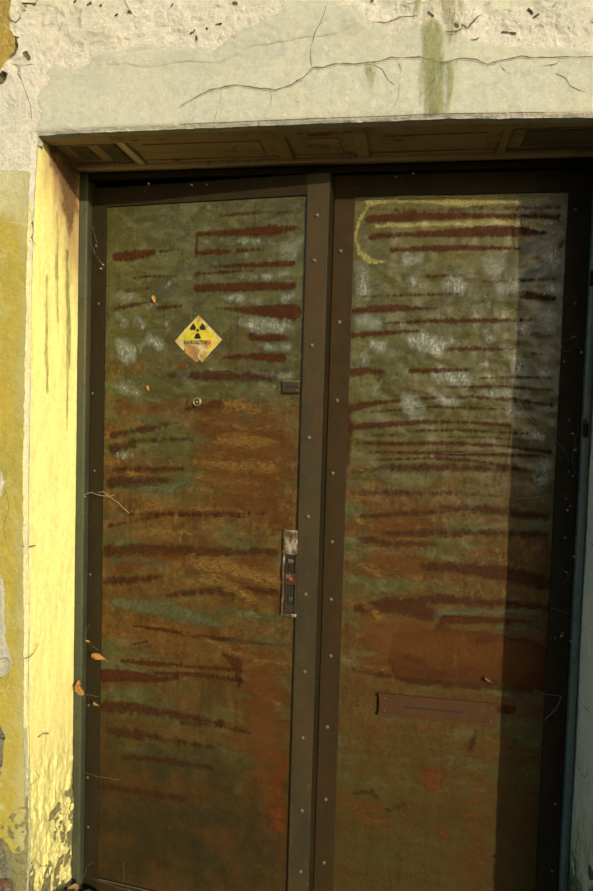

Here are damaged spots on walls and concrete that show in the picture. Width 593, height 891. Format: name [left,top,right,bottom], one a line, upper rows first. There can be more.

flaking render [0,0,38,84]
crack [181,5,593,123]
leakage [424,0,455,111]
corrosion [193,224,296,293]
corrosion [366,203,562,253]
corrosion [221,303,301,321]
corrosion [249,332,287,342]
corrosion [351,292,532,338]
corrosion [347,376,552,473]
peeling [0,169,74,891]
corrosion [351,489,550,590]
corrosion [100,626,259,687]